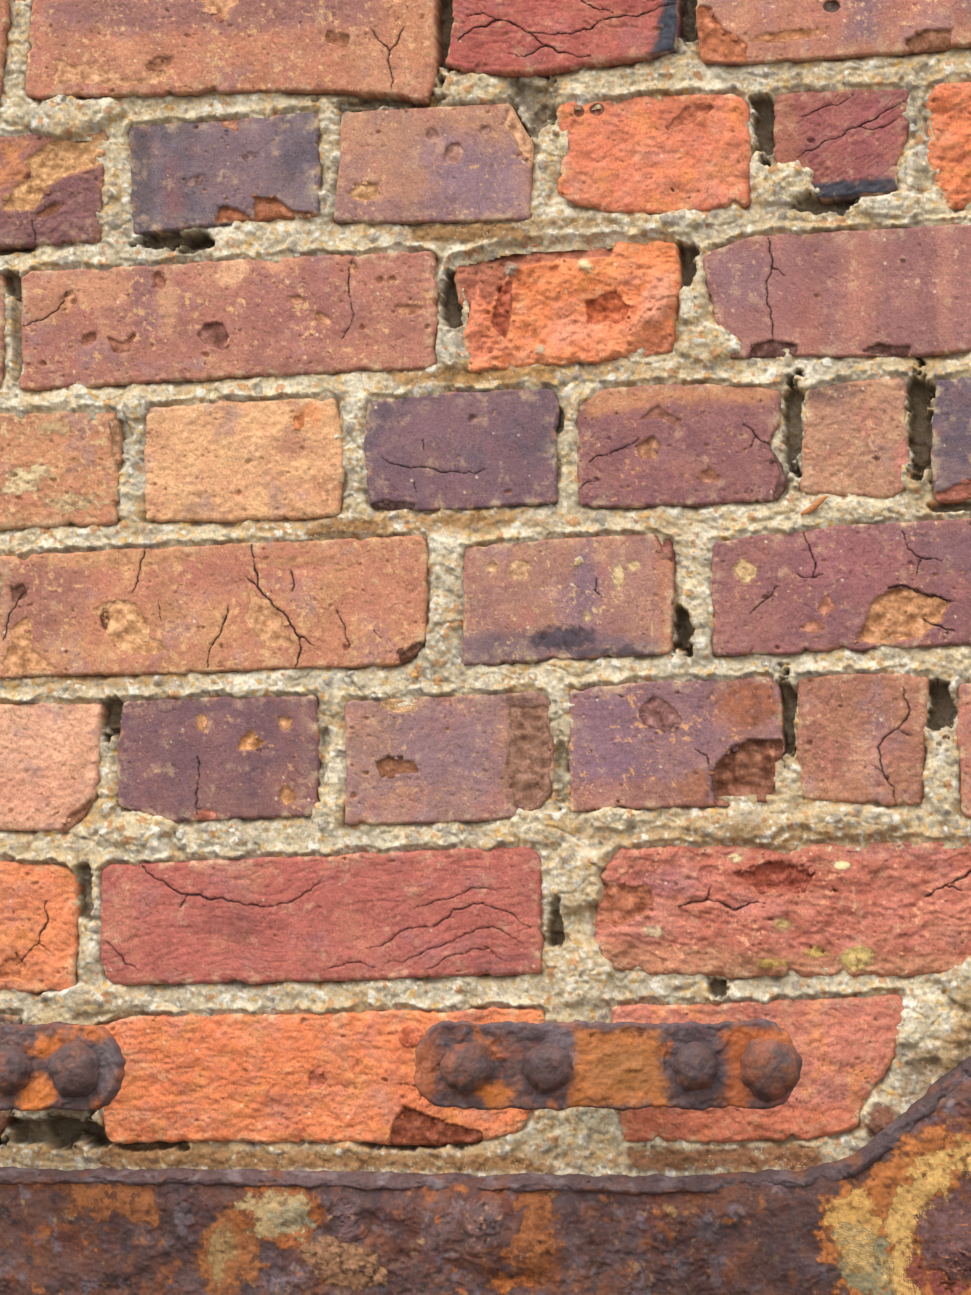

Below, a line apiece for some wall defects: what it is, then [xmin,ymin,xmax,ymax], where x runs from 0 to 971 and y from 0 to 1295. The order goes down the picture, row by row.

crack [458,0,675,57]
crack [247,545,309,669]
spalling [854,588,949,644]
spalling [707,740,783,805]
crack [142,865,317,908]
crack [924,870,971,897]
crack [330,887,531,968]
corrosion [99,1145,555,1172]
corrosion [627,1145,823,1171]
corrosion [2,1183,159,1228]
corrosion [812,1104,971,1295]
corrosion [191,1186,387,1295]